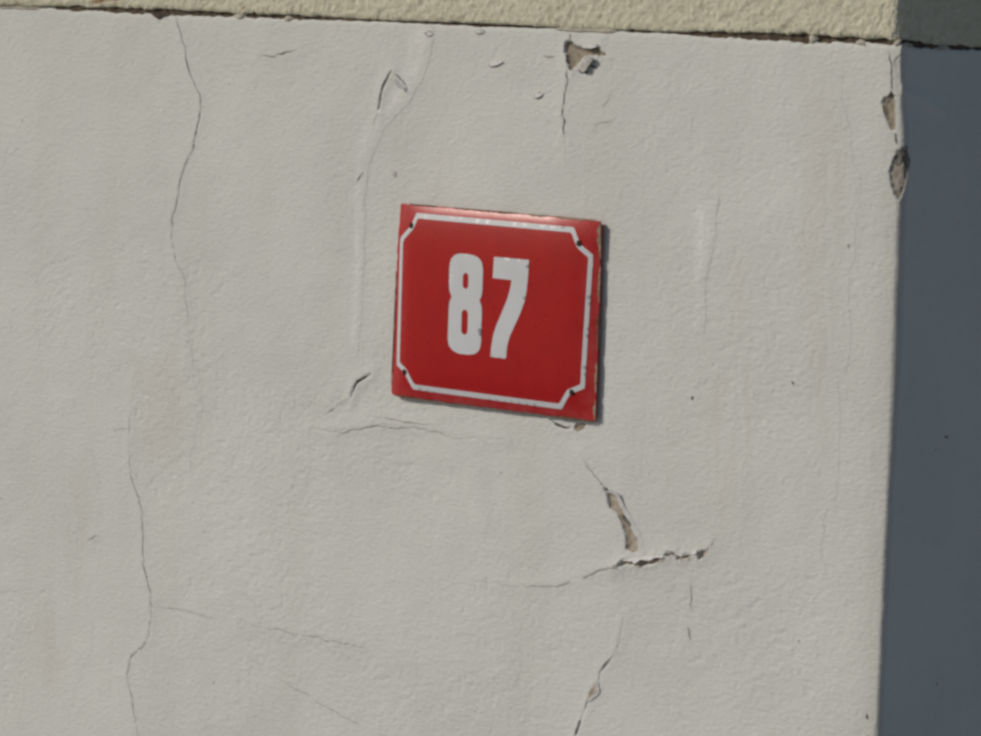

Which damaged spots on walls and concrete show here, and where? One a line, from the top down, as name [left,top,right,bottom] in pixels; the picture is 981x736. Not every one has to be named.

crack [171,20,201,280]
crack [561,73,569,134]
spalling [565,34,606,74]
spalling [882,92,911,199]
crack [325,374,371,414]
crack [550,419,586,432]
crack [114,374,211,734]
spalling [580,456,715,579]
crack [574,621,623,736]